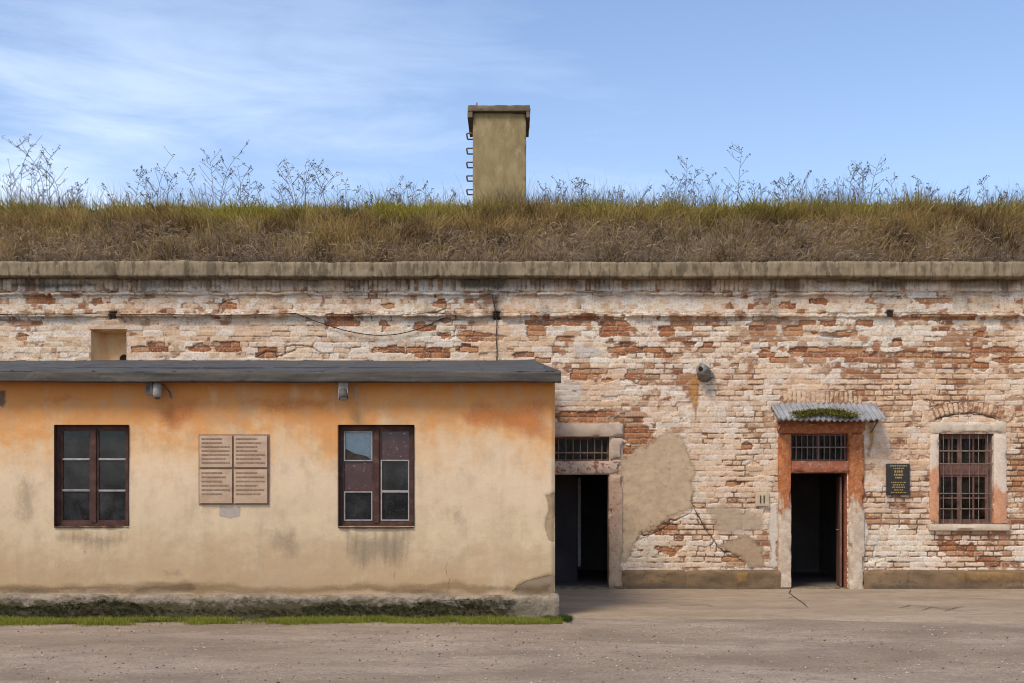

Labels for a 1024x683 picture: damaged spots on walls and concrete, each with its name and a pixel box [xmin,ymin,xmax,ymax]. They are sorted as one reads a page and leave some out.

flaking render [545,493,555,542]
flaking render [636,520,682,557]
crack [644,499,729,552]